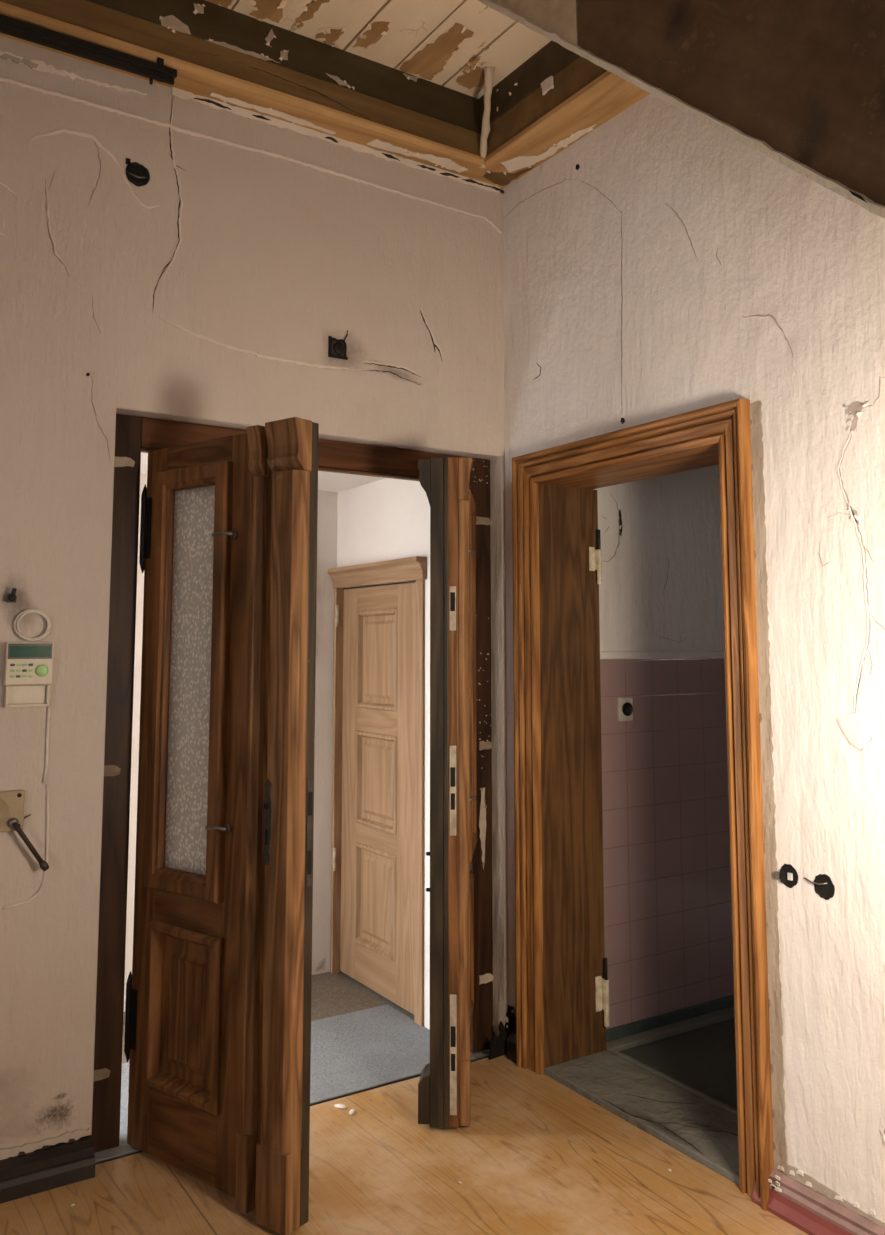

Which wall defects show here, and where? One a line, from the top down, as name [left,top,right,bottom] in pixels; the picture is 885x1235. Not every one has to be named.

peeling [159,3,206,35]
peeling [205,0,390,63]
peeling [326,73,355,90]
peeling [399,23,517,95]
peeling [541,76,554,95]
peeling [172,87,596,194]
crack [152,96,184,313]
crack [665,204,721,264]
crack [362,309,444,385]
crack [744,314,796,374]
crack [832,433,885,719]